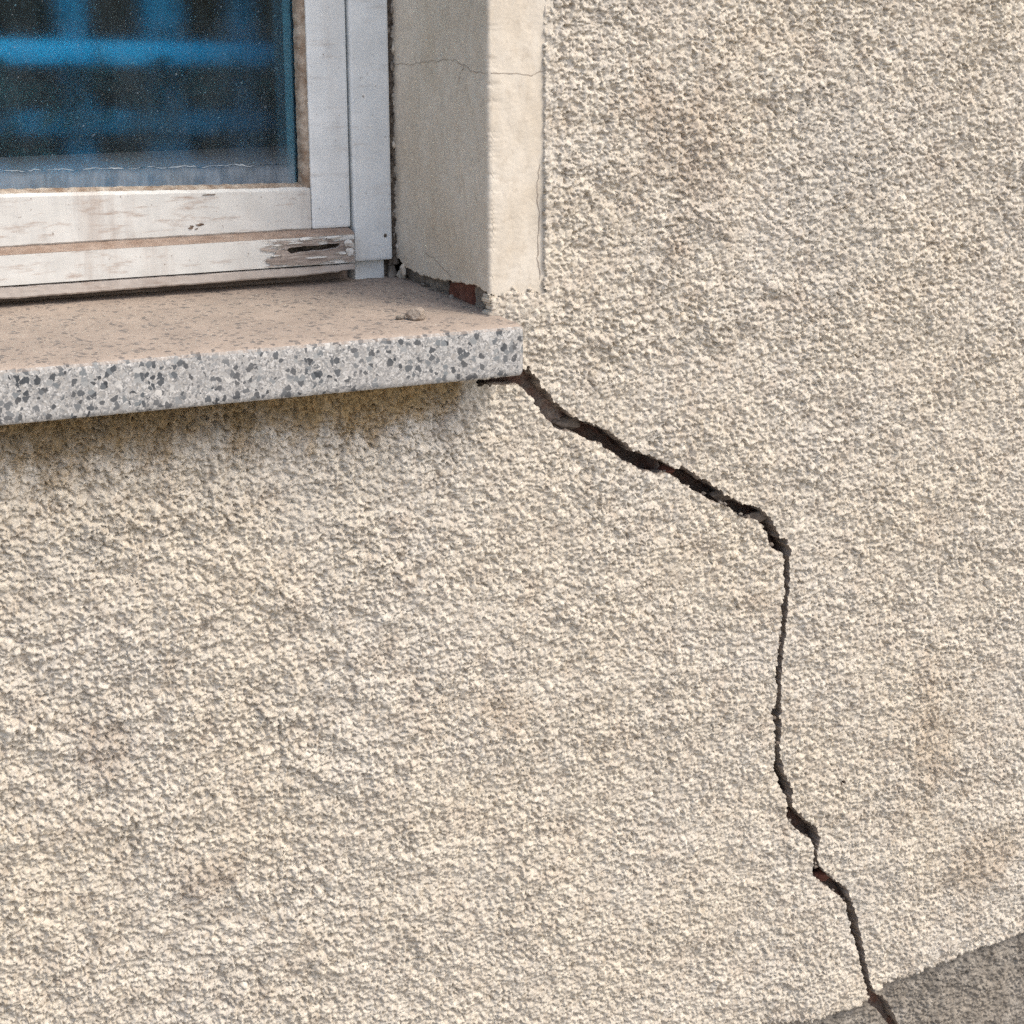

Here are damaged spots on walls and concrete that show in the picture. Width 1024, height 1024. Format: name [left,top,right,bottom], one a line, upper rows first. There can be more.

crack [476,366,898,1024]